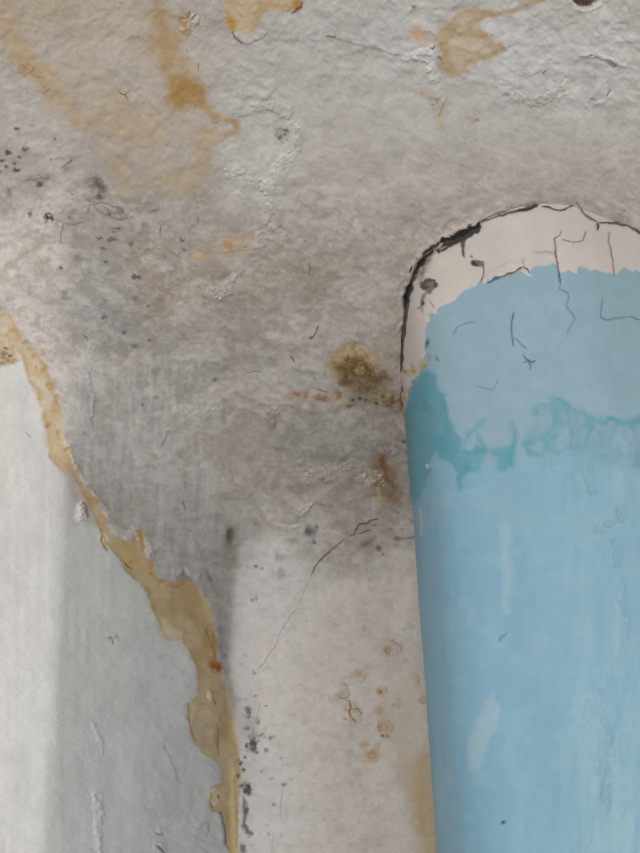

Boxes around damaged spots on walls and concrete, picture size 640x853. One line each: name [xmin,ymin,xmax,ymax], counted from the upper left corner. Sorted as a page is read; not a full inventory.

water stain [219,0,305,40]
water stain [407,0,548,82]
water stain [0,0,251,264]
water stain [181,229,262,267]
spalling [417,223,486,314]
crack [399,202,640,408]
peeling [404,367,640,537]
spalling [47,421,243,853]
water stain [217,519,242,554]
mould [253,523,320,582]
crack [256,518,378,671]
mould [235,691,283,853]